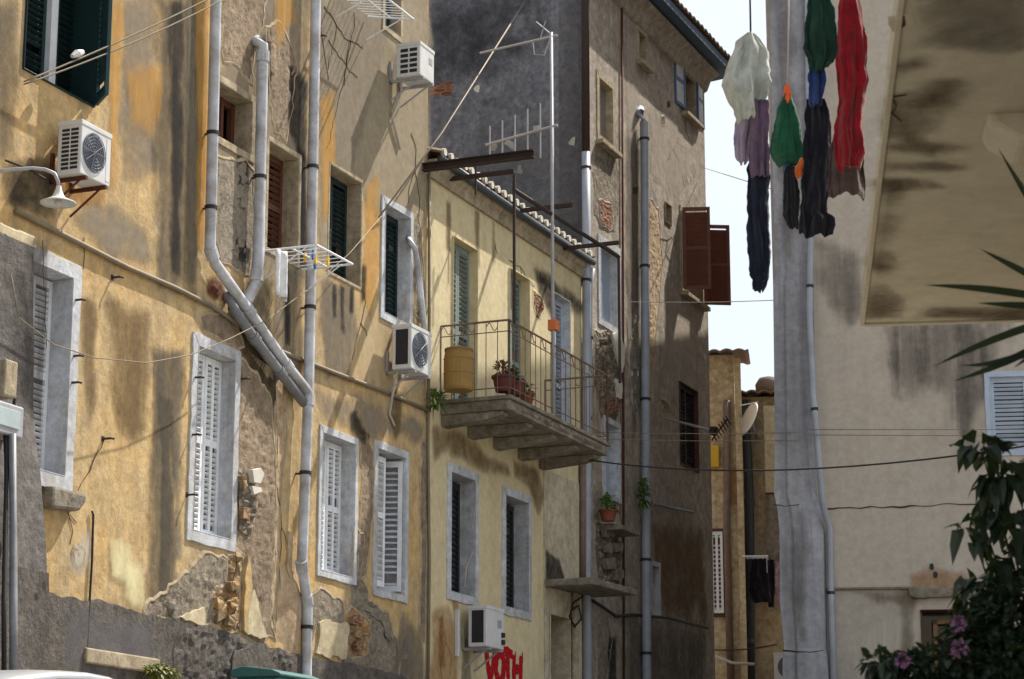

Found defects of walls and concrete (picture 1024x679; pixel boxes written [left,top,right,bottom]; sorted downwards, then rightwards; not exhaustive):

water stain [135,0,208,285]
rust [208,278,225,299]
peeling [218,0,456,323]
flaking render [593,140,691,433]
water stain [882,181,915,190]
water stain [933,310,1024,320]
flaking render [142,311,299,679]
flaking render [312,398,428,679]
water stain [434,429,542,504]